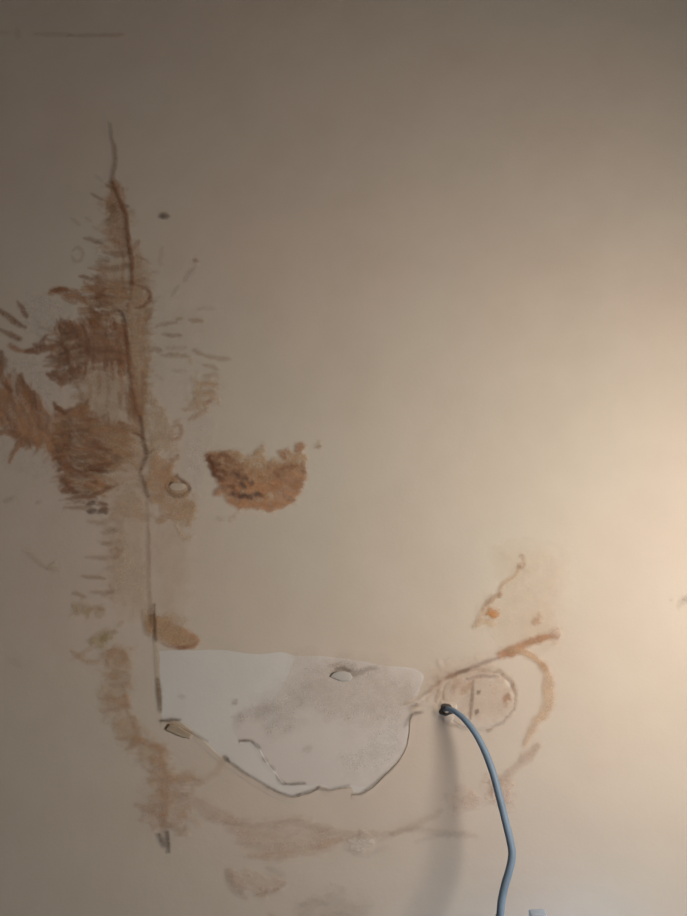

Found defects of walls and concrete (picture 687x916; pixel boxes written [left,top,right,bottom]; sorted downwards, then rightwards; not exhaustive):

water stain [0,270,196,522]
water stain [146,614,198,649]
water stain [499,629,560,669]
crack [156,679,164,711]
peeling [159,649,424,803]